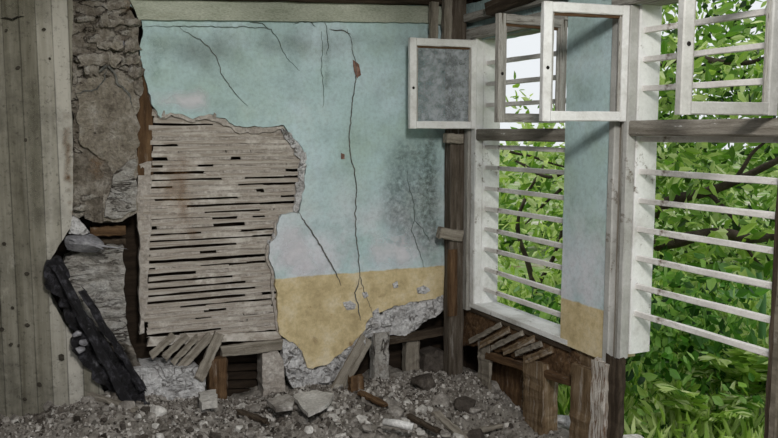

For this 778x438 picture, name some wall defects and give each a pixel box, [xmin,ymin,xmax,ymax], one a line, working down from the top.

flaking render [69,215,90,235]
crack [145,22,297,106]
spalling [139,109,444,388]
crack [295,21,372,320]